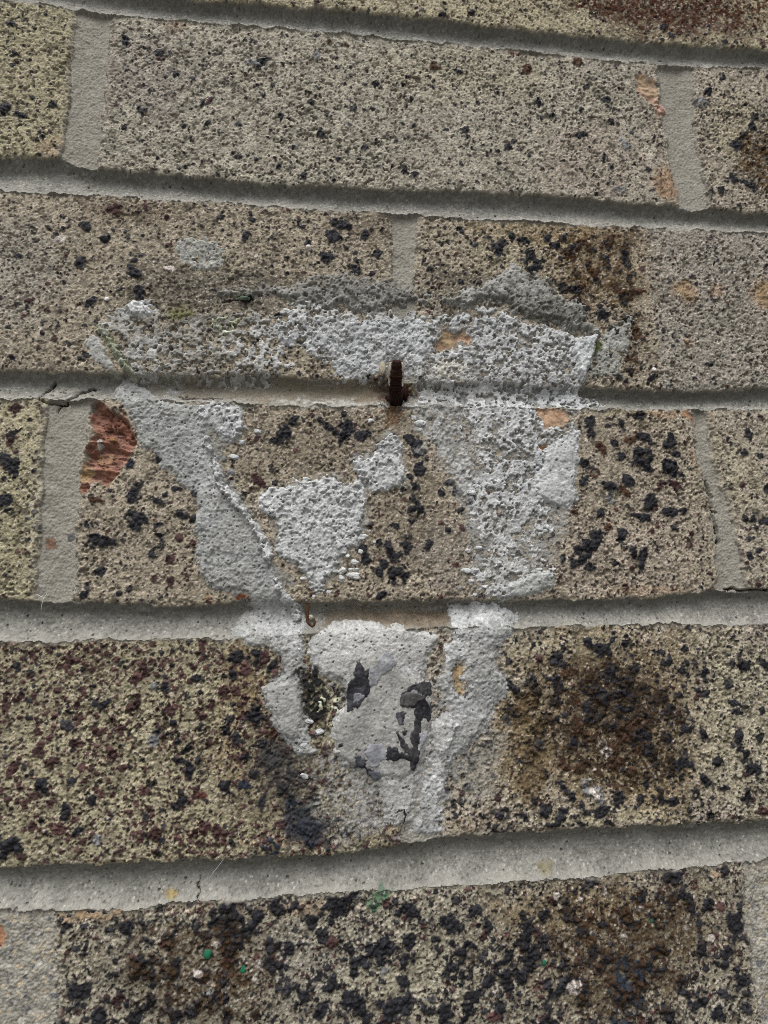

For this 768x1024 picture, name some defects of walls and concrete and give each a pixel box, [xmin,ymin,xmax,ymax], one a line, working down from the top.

spalling [79,400,137,495]
water stain [535,657,684,792]